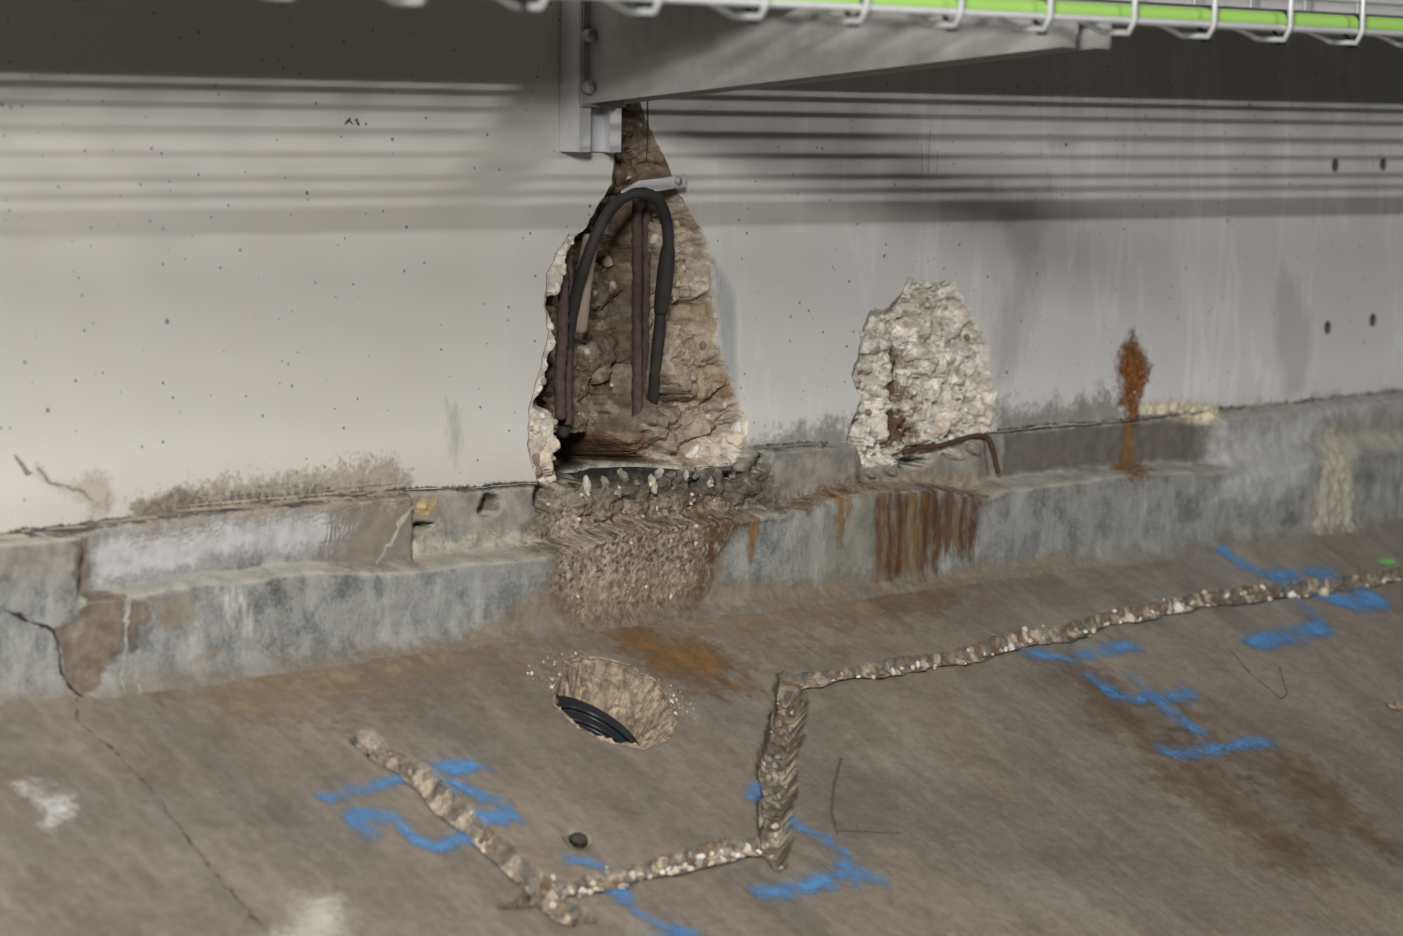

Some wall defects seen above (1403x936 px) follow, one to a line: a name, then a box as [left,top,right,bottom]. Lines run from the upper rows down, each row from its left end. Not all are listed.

spalling [525,102,781,630]
spalling [846,277,997,478]
rust [1112,330,1152,480]
rust [774,478,987,585]
crack [4,610,269,936]